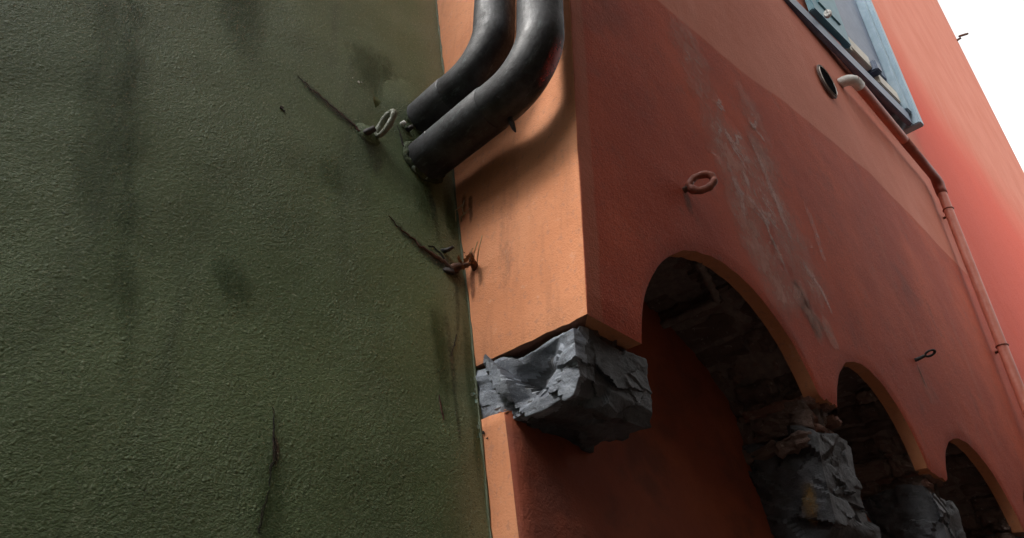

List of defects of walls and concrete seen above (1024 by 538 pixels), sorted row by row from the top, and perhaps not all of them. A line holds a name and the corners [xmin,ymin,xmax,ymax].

crack [257,407,279,533]